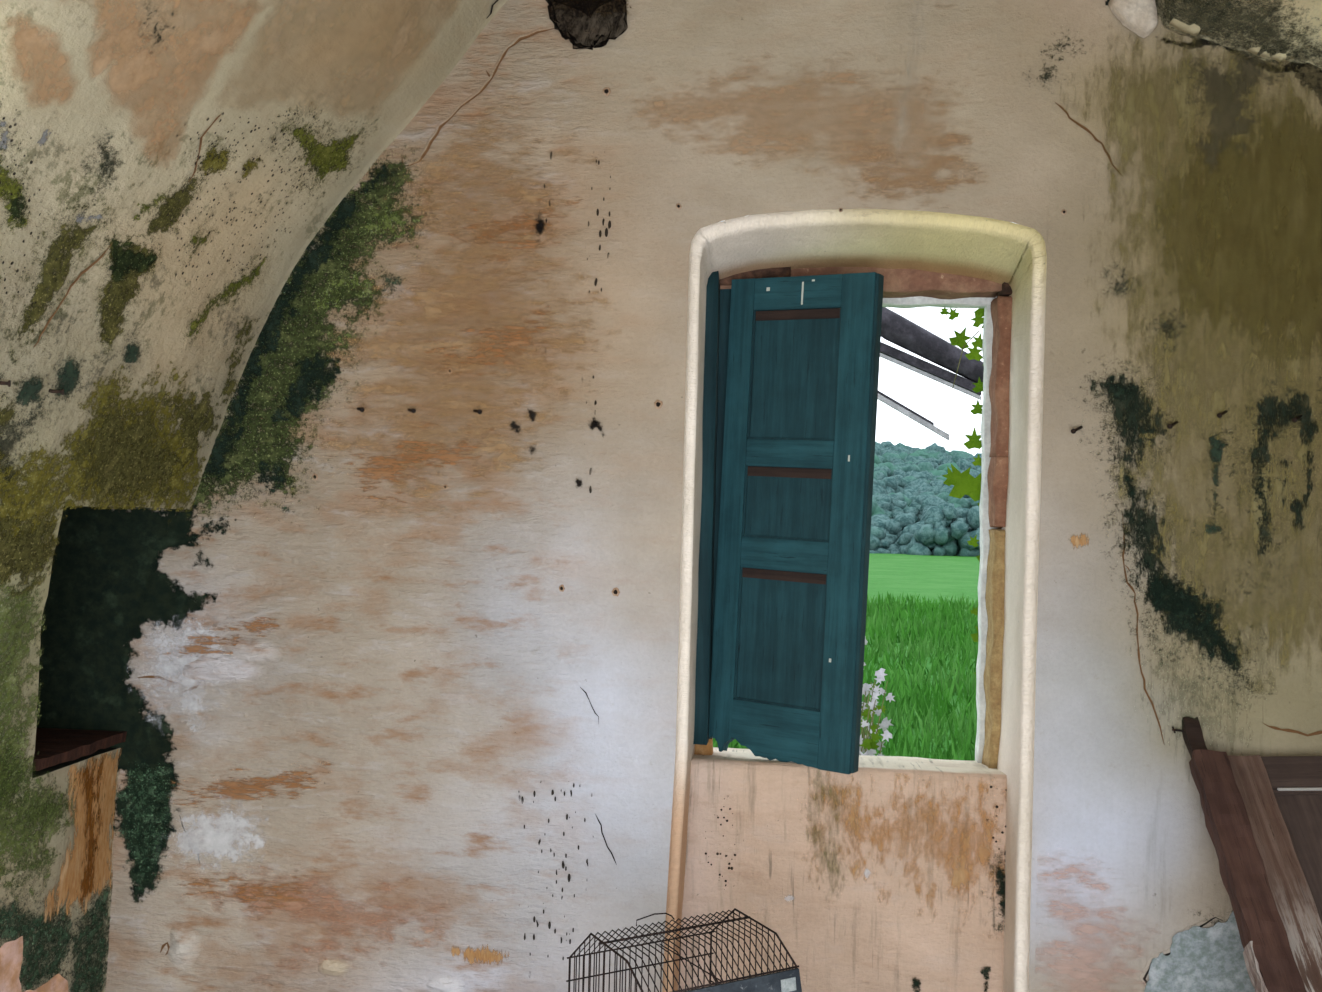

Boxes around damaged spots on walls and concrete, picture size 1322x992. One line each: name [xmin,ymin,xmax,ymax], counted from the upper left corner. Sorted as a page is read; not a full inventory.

crack [402,26,554,166]
leakage [120,333,145,373]
leakage [1080,0,1322,705]
leakage [0,354,84,481]
crack [1122,515,1164,743]
leakage [36,505,331,992]
flaking render [0,936,69,992]
leakage [451,944,509,965]
leakage [524,819,588,960]
leakage [980,967,991,992]
leakage [982,805,1006,930]
flaking render [1144,911,1255,992]